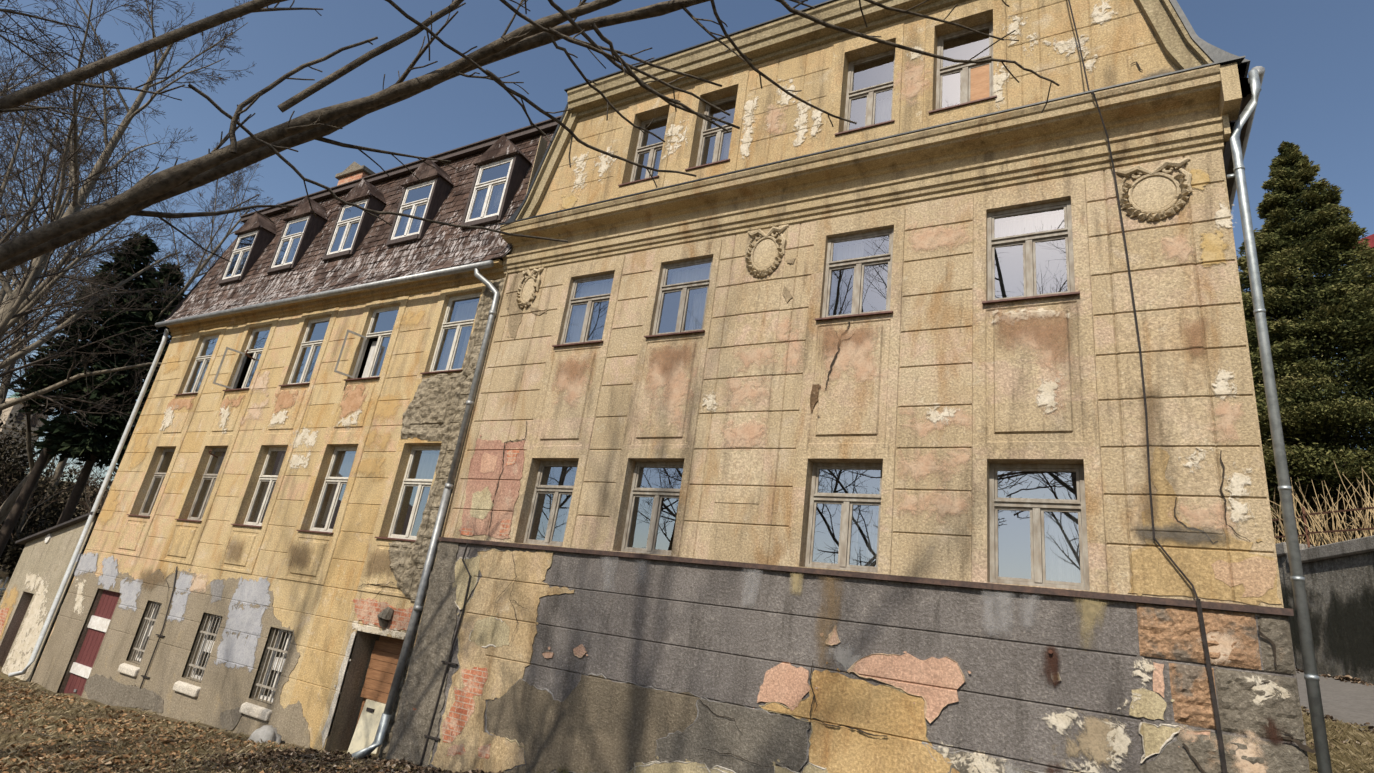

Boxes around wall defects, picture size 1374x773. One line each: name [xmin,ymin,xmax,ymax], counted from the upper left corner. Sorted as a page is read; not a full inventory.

peeling [740,79,823,158]
peeling [911,226,968,250]
peeling [1163,204,1234,268]
crack [825,321,855,389]
spalling [0,272,1282,773]
corrosion [1044,646,1061,685]
peeling [1244,675,1290,705]